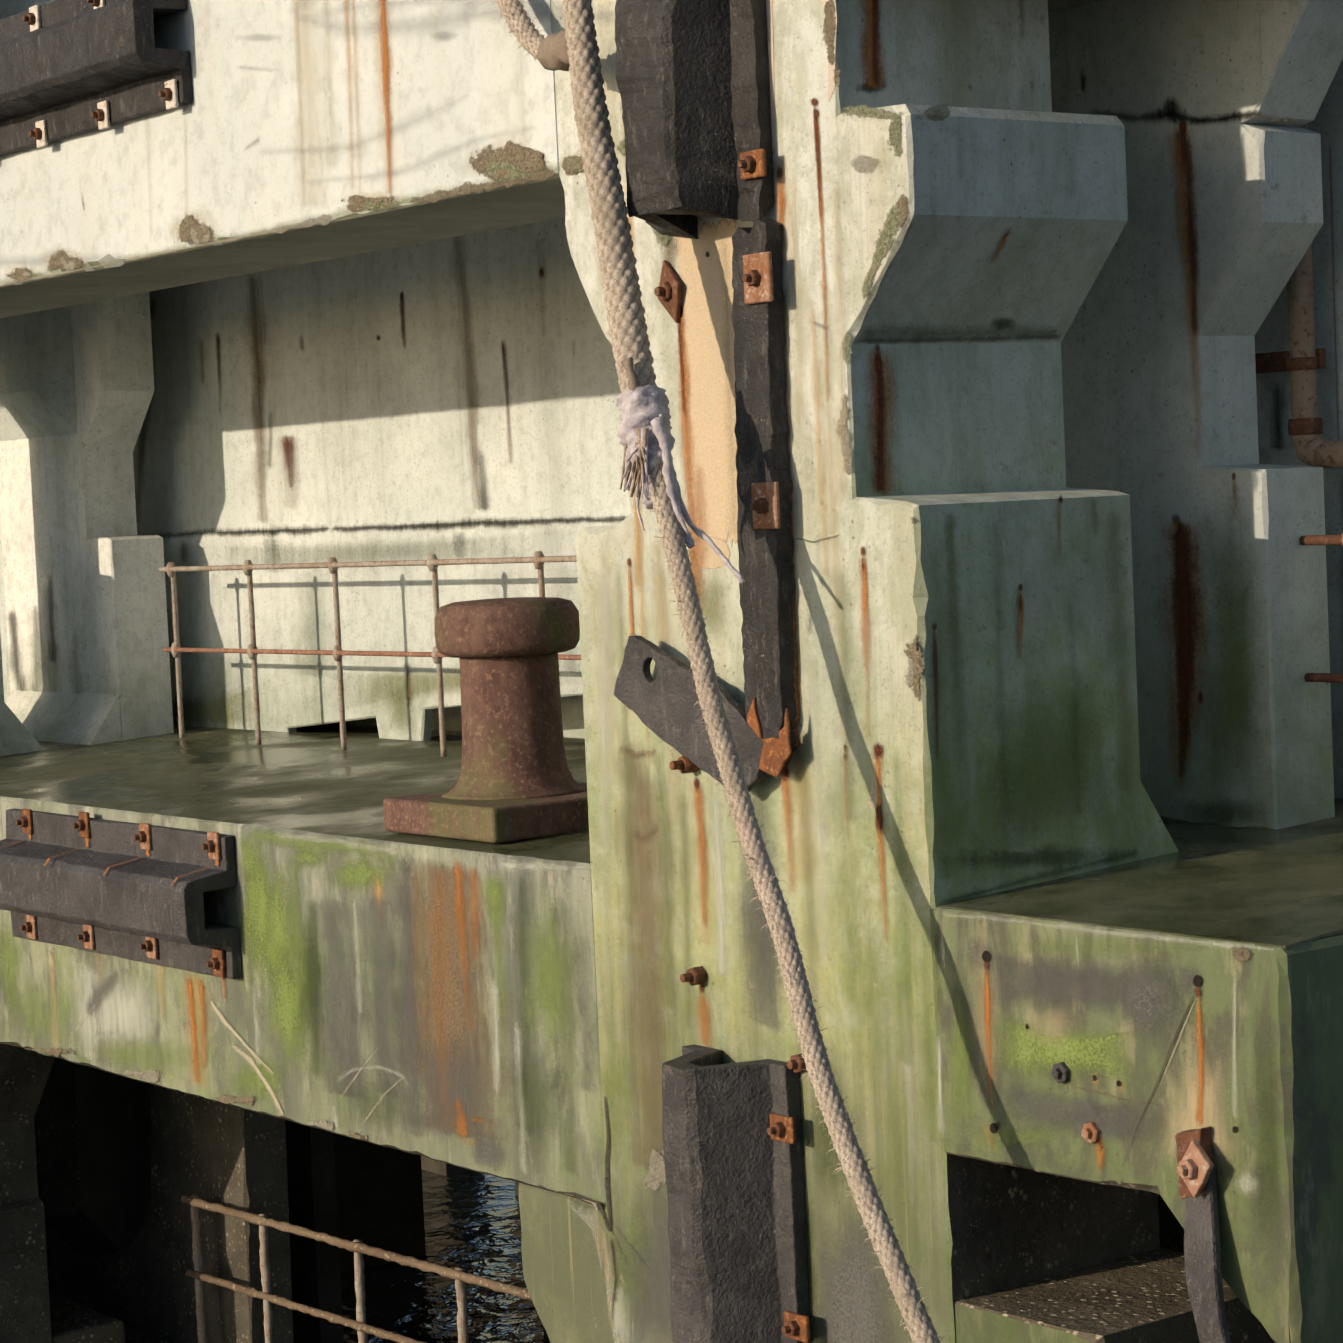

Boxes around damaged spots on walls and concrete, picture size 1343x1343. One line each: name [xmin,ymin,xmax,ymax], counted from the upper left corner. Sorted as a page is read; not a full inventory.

rust [381,0,390,168]
rust [862,0,884,92]
spalling [341,140,584,212]
spalling [0,214,332,286]
water stain [250,280,264,485]
rust [871,345,892,492]
rust [1172,516,1204,777]
rust [874,744,884,887]
water stain [242,843,269,951]
water stain [233,1045,283,1115]
water stain [269,938,357,1095]
crack [539,1097,617,1300]